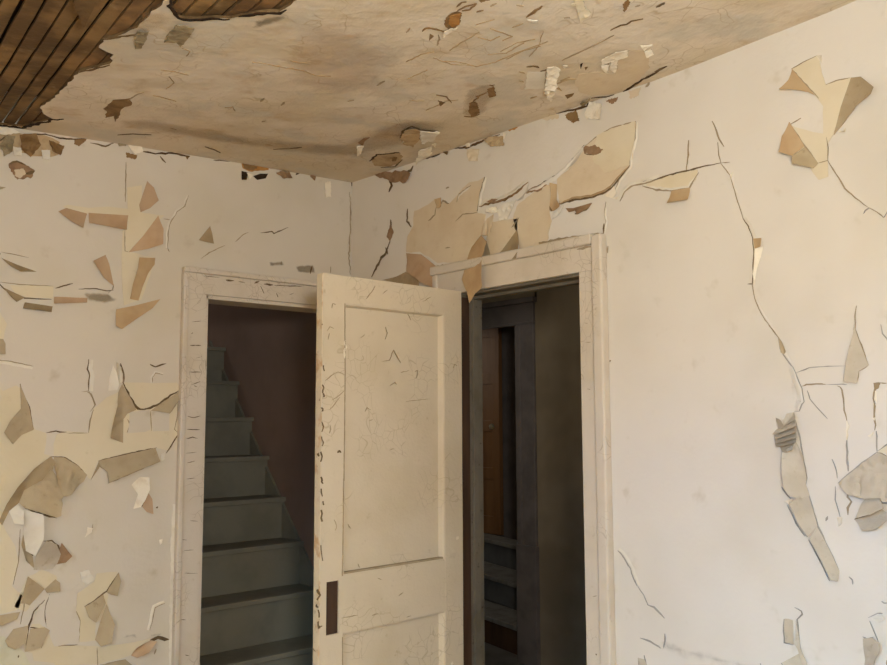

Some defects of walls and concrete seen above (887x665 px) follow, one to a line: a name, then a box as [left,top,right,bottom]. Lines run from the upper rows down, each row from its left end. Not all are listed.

crack [32,133,230,163]
peeling [116,181,165,329]
flaking render [0,0,292,180]
crack [406,19,548,79]
peeling [406,121,636,263]
crack [539,122,665,253]
crack [562,19,643,61]
crack [542,66,667,123]
crack [712,121,849,471]
peeling [779,55,873,180]
peeling [0,359,179,665]
peeling [835,444,887,531]